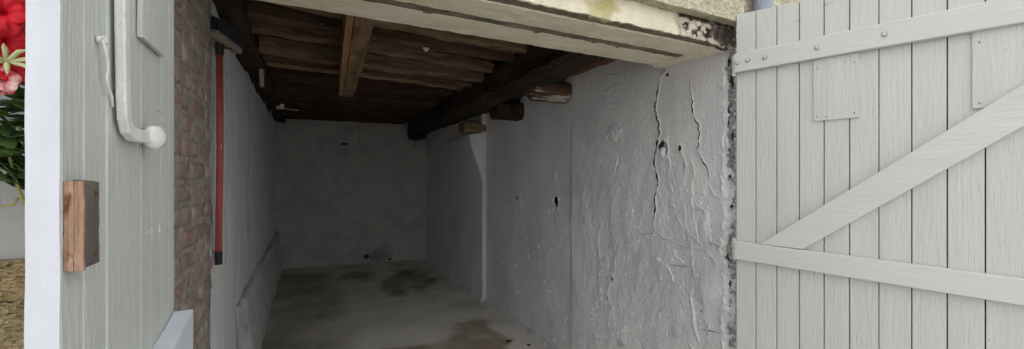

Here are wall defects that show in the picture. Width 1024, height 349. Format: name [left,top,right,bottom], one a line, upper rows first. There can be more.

spalling [657,137,683,161]
crack [641,68,727,279]
spalling [677,13,737,349]